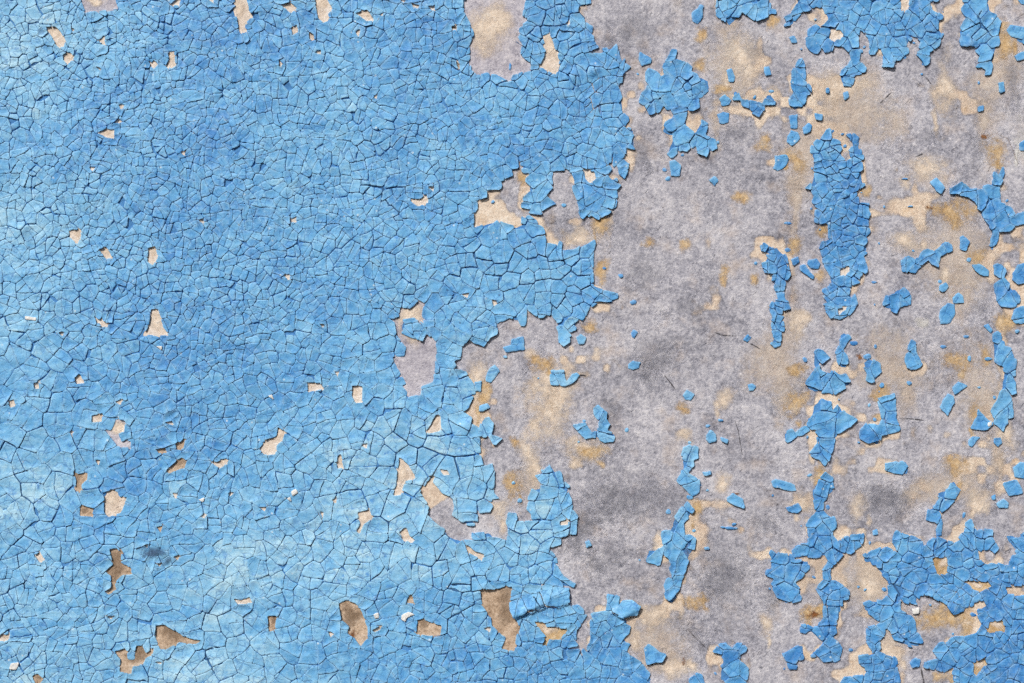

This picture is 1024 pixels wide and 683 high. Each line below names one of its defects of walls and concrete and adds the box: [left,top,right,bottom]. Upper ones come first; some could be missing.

crack [718,0,1024,84]
crack [734,63,810,112]
crack [714,248,788,349]
crack [0,0,711,683]
crack [767,130,1024,683]
peeling [765,532,822,589]
peeling [814,516,865,571]
peeling [896,556,1024,619]
peeling [926,465,1024,586]
crack [689,631,744,683]
peeling [840,617,901,683]
peeling [892,595,1024,683]